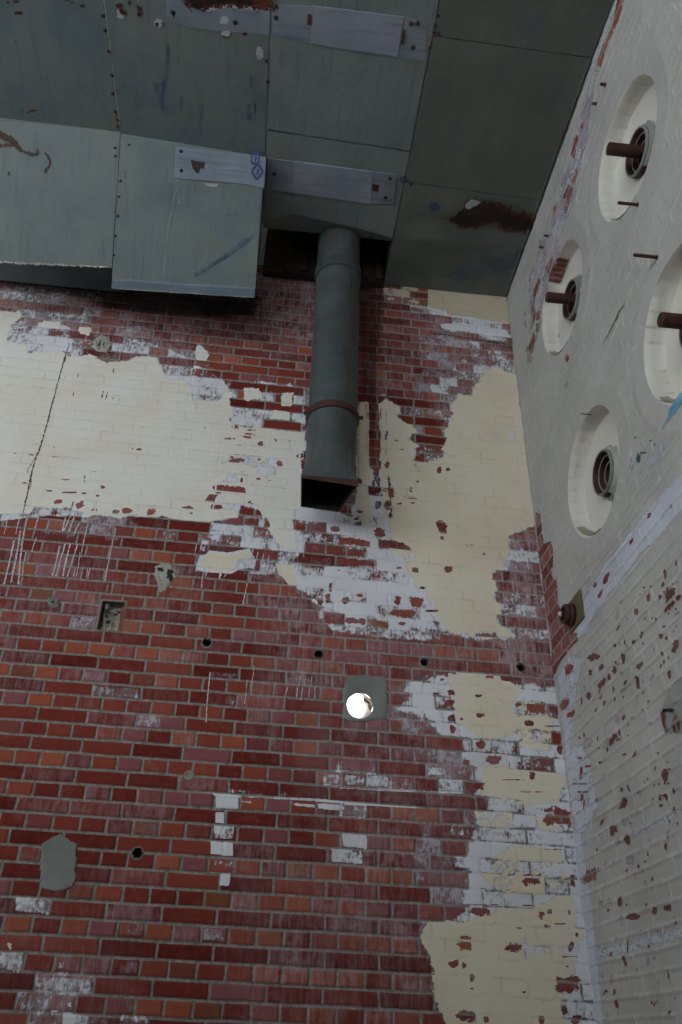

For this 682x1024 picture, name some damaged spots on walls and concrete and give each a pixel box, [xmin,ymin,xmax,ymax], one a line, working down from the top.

rust [115,1,144,19]
rust [183,0,276,38]
rust [439,199,537,235]
crack [23,342,101,512]
peeling [0,286,682,1024]